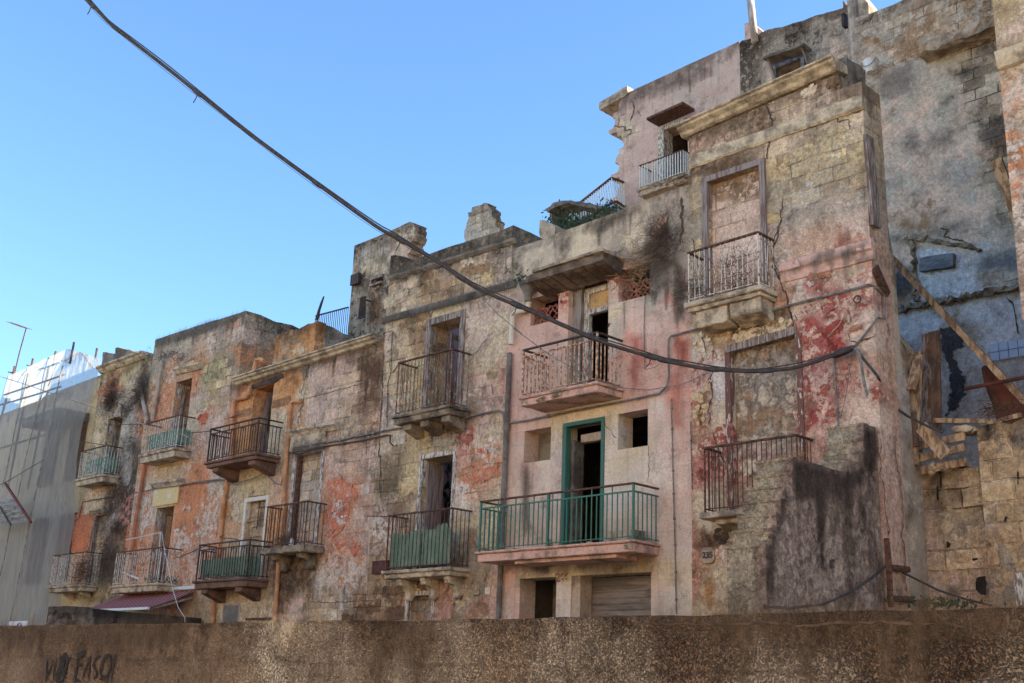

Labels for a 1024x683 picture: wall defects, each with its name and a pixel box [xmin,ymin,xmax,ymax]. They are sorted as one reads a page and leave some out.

water stain [652,267,684,321]
crack [771,199,797,327]
flaking render [732,267,865,362]
crack [940,228,973,246]
flaking render [693,331,725,426]
water stain [120,453,131,494]
peeling [326,476,371,533]
water stain [779,431,878,566]